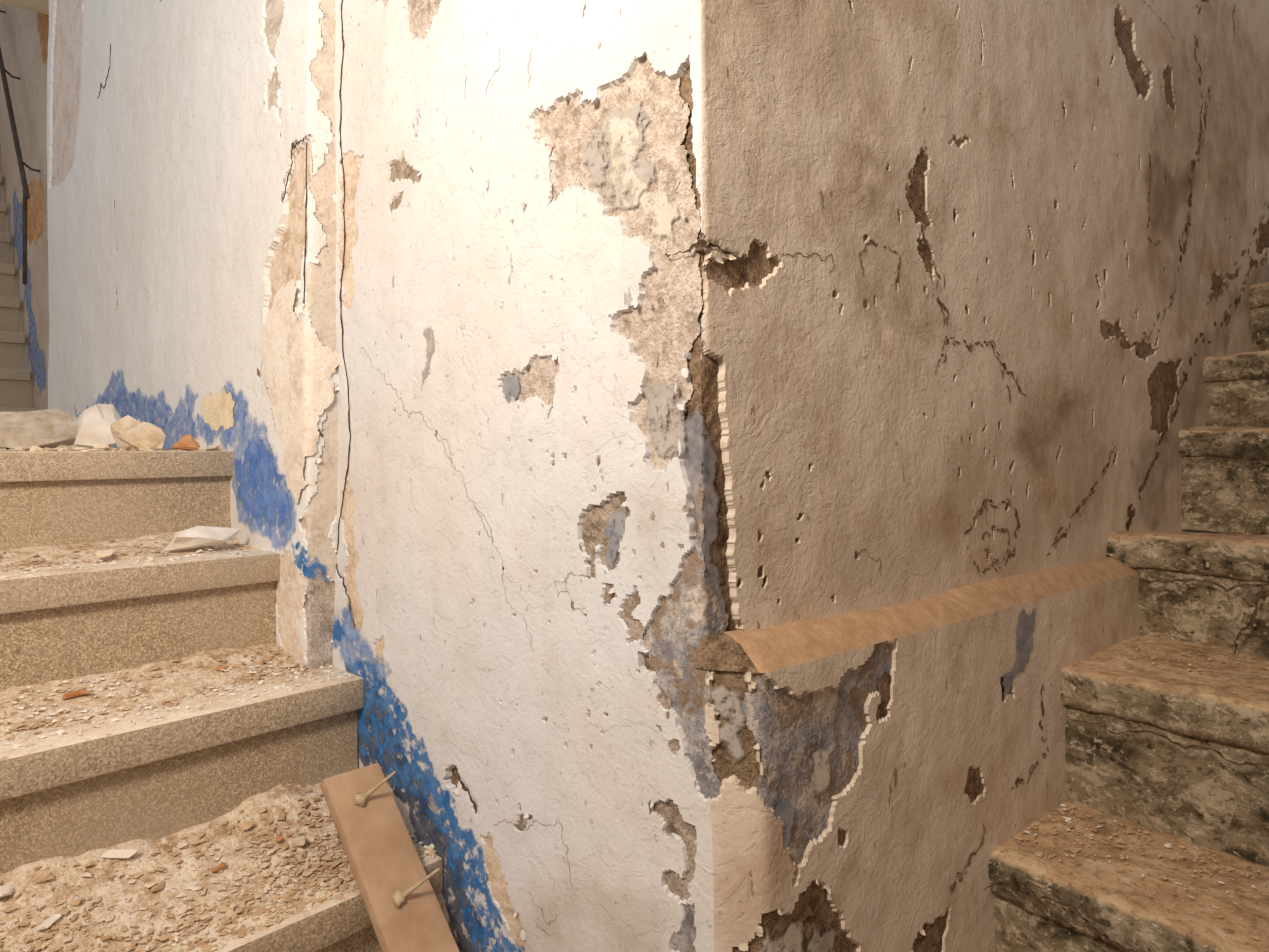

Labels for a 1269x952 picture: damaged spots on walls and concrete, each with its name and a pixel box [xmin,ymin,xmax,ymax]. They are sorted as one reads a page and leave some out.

flaking render [407,0,442,40]
peeling [1110,8,1175,126]
flaking render [263,0,363,352]
peeling [387,155,421,212]
crack [665,239,738,258]
crack [905,139,1027,403]
flaking render [502,355,560,417]
flaking render [276,366,364,670]
flaking render [528,51,893,952]
peeling [964,766,984,803]
flaking render [483,797,573,951]
peeling [911,907,948,952]